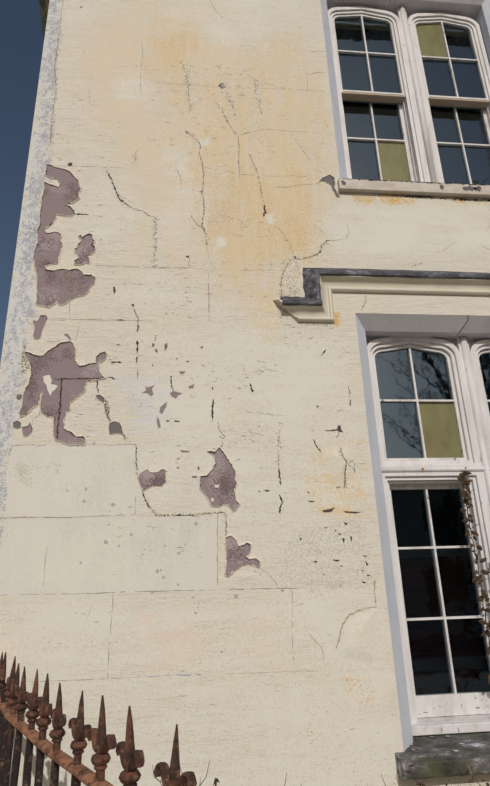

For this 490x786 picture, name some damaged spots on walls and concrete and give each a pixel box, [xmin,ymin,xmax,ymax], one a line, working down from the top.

spalling [0,0,108,544]
crack [105,167,156,260]
crack [186,85,349,299]
damp [60,0,490,347]
spalling [317,174,346,198]
peeling [0,256,410,786]